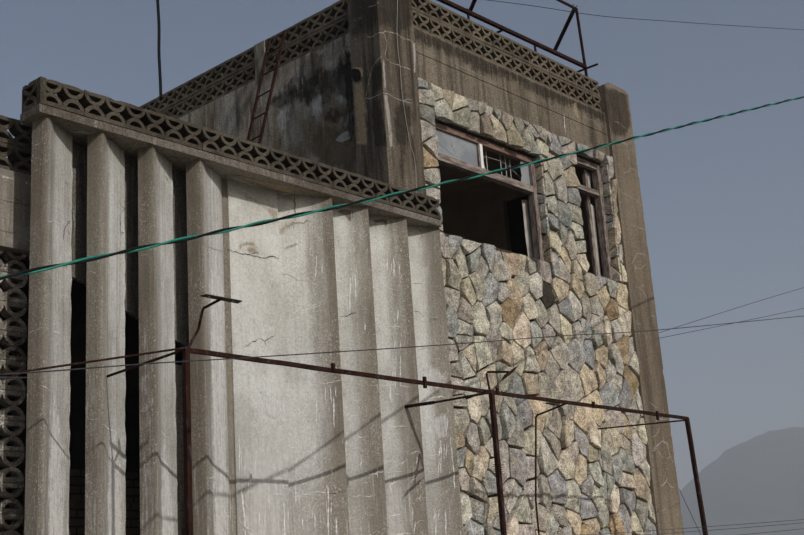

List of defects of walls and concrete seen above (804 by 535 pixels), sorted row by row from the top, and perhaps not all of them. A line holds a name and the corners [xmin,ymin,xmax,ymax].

leakage [306,51,411,169]
crack [355,31,415,110]
leakage [351,0,630,136]
leakage [209,255,229,535]
leakage [238,397,316,535]
crack [275,451,439,513]
leakage [423,368,444,390]
leakage [428,408,455,488]